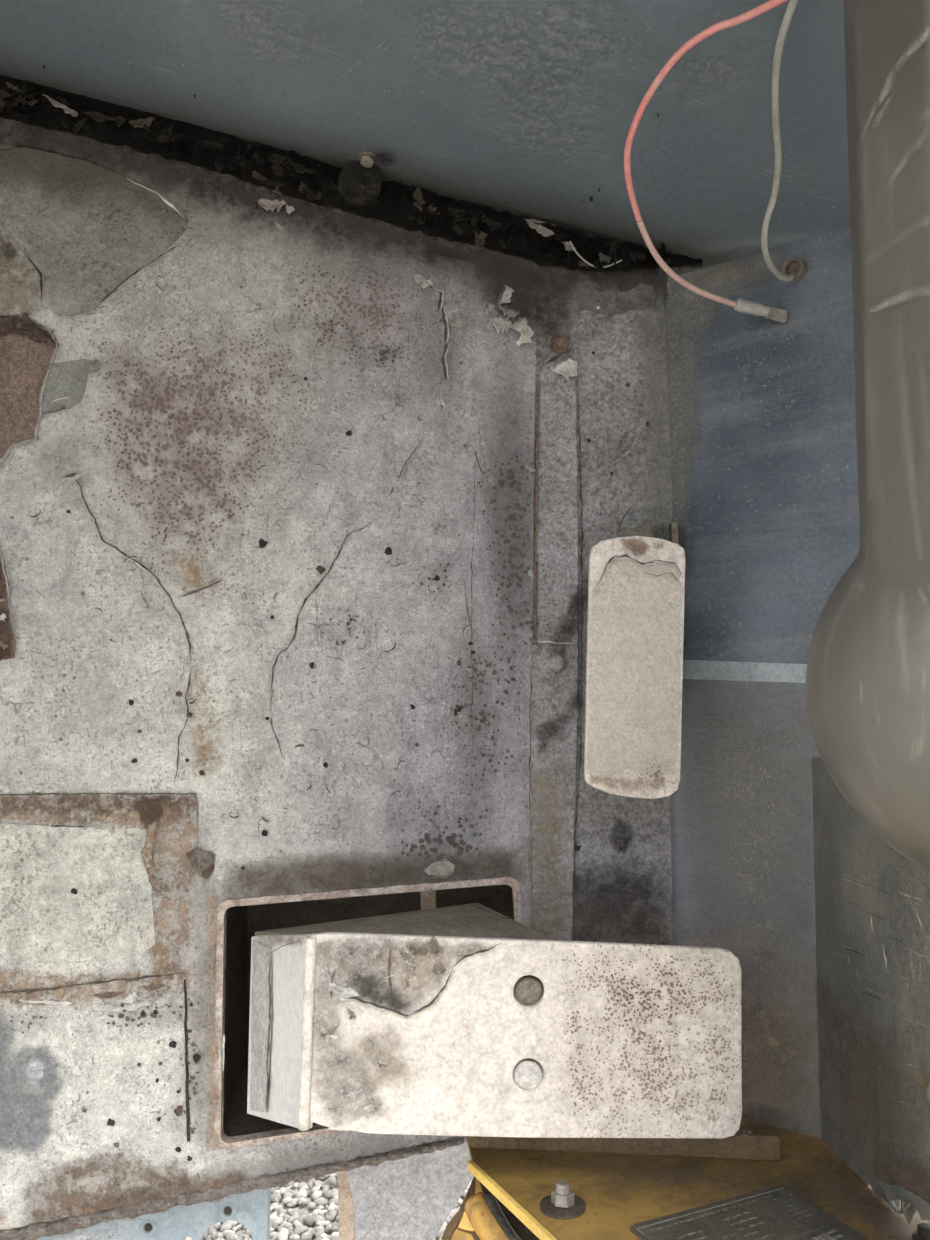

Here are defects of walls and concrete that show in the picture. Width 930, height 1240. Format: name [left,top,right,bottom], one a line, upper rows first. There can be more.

peeling [0,144,188,318]
crack [0,473,198,888]
crack [268,436,425,758]
rust [0,793,197,1004]